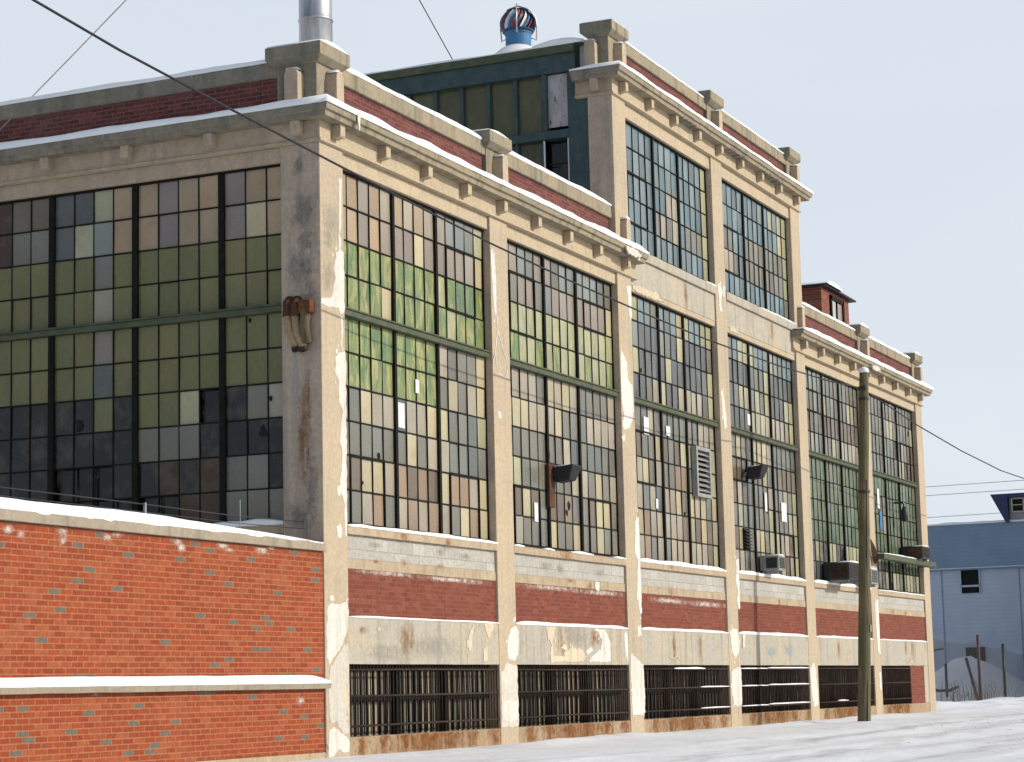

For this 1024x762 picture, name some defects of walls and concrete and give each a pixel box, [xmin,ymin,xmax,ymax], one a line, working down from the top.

peeling [320,178,347,539]
peeling [620,350,634,442]
peeling [326,595,349,665]
flaking render [546,626,611,663]
flaking render [501,617,519,728]
flaking render [729,624,745,707]
flaking render [329,727,350,757]
corrosion [382,731,476,749]
corrosion [547,721,629,739]
corrosion [671,716,727,729]
corrosion [750,710,811,723]
corrosion [825,707,858,717]